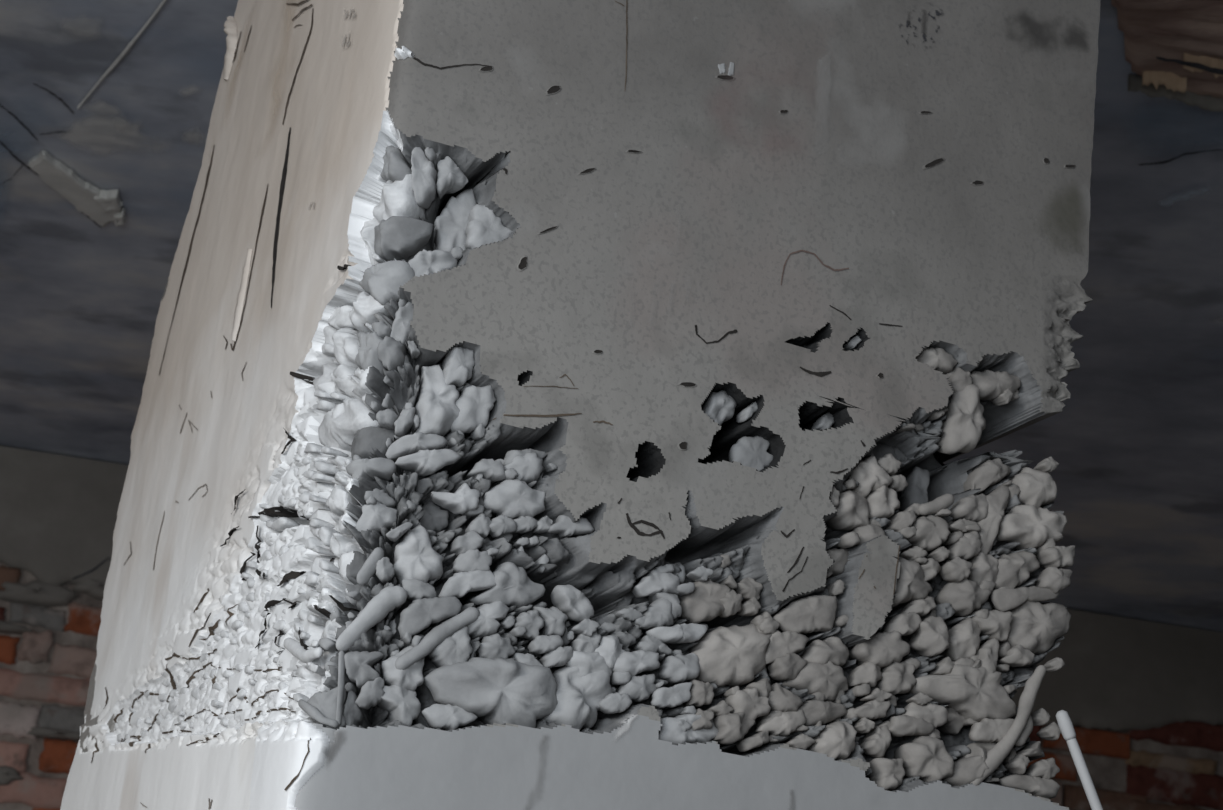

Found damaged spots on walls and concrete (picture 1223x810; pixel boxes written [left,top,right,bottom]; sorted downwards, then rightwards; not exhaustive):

crack [0,83,74,185]
crack [223,8,313,380]
crack [159,147,214,375]
crack [281,429,297,454]
crack [290,371,316,385]
spalling [626,441,666,482]
spalling [677,382,786,472]
spalling [785,322,870,353]
spalling [798,396,864,431]
spalling [1043,274,1092,415]
crack [72,484,360,762]
flaking render [0,562,105,810]